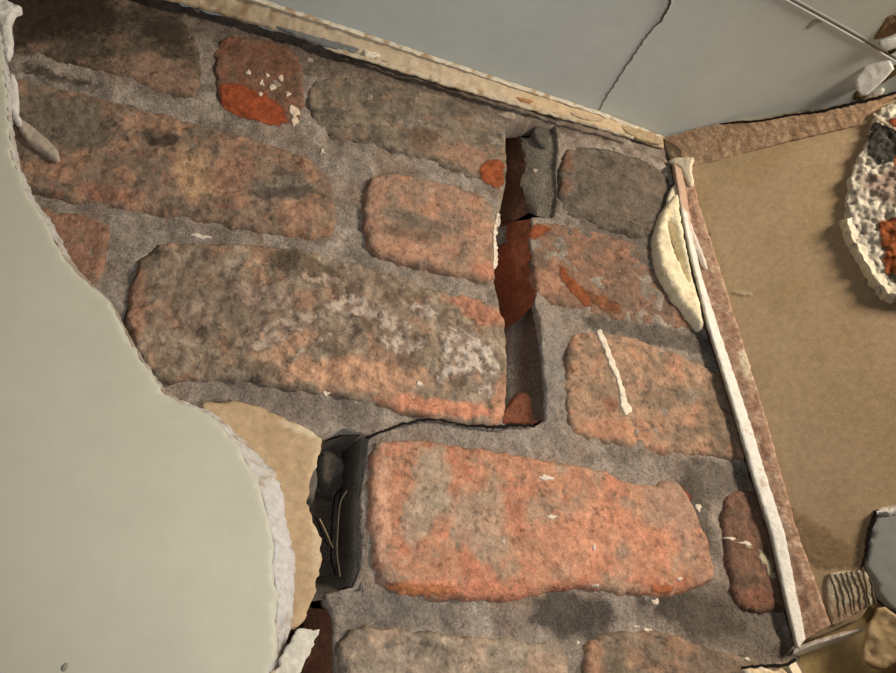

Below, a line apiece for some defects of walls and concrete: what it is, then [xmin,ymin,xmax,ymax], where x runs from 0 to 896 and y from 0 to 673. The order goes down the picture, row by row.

peeling [0,0,23,62]
crack [598,0,672,111]
peeling [10,73,60,163]
spalling [165,0,896,656]
crack [282,126,557,673]
spalling [775,662,802,673]